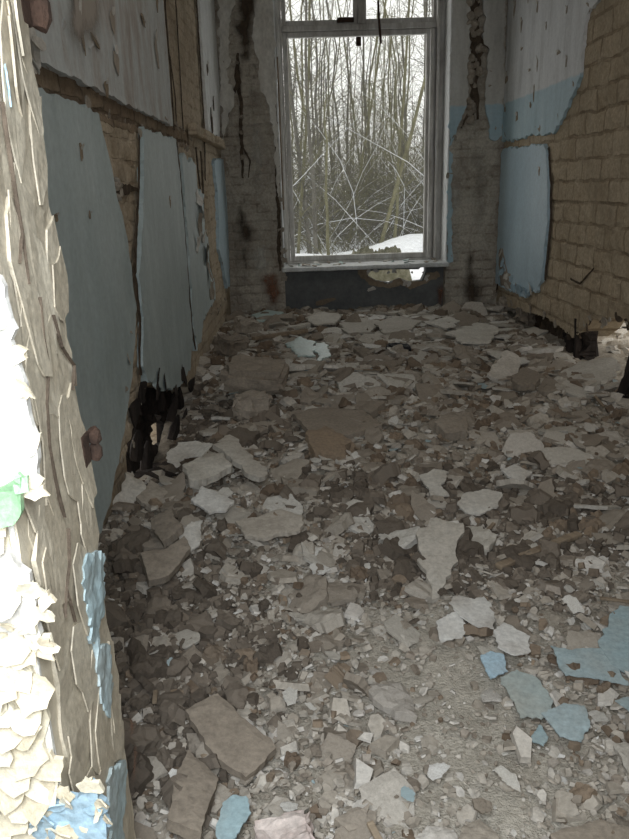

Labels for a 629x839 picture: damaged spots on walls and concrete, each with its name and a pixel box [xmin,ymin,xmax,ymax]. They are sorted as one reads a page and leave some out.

crack [228,53,251,178]
crack [461,0,489,128]
spalling [444,0,629,339]
peeling [0,0,288,839]